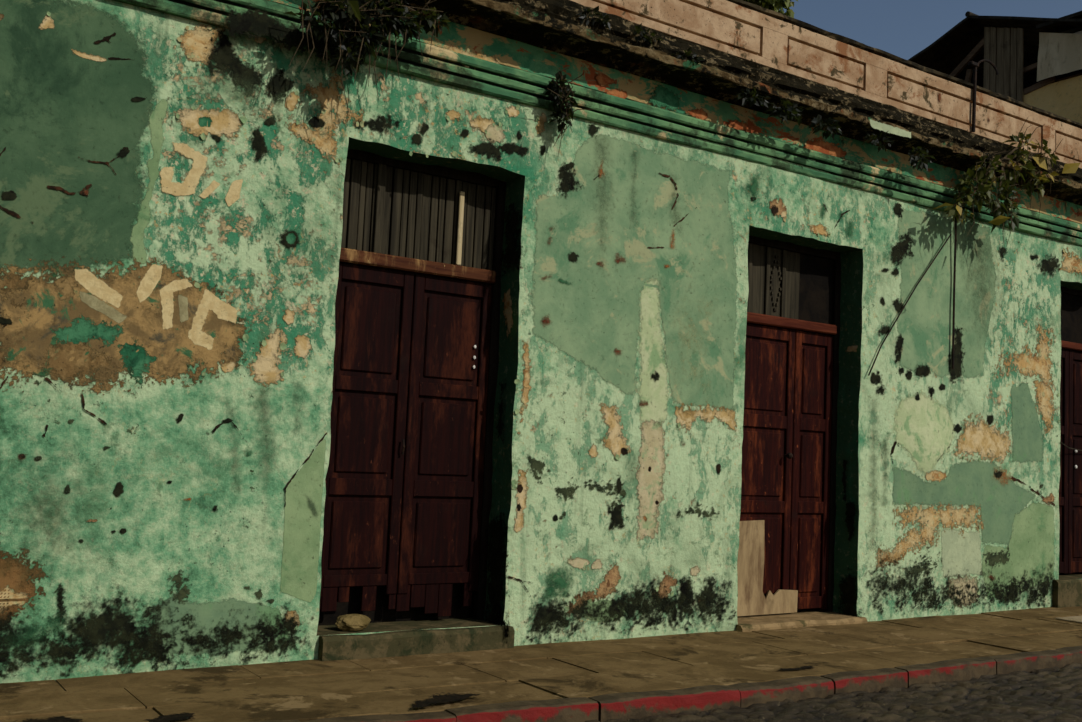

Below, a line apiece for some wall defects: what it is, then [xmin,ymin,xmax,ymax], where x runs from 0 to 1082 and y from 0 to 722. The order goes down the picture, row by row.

peeling [177,23,226,66]
peeling [174,104,247,140]
peeling [279,74,365,167]
water stain [500,202,523,276]
peeling [0,254,312,400]
peeling [953,412,1012,464]
water stain [113,482,124,497]
peeling [875,499,984,570]
water stain [0,569,306,677]
water stain [482,507,514,644]
water stain [526,577,736,644]
water stain [834,541,1055,617]